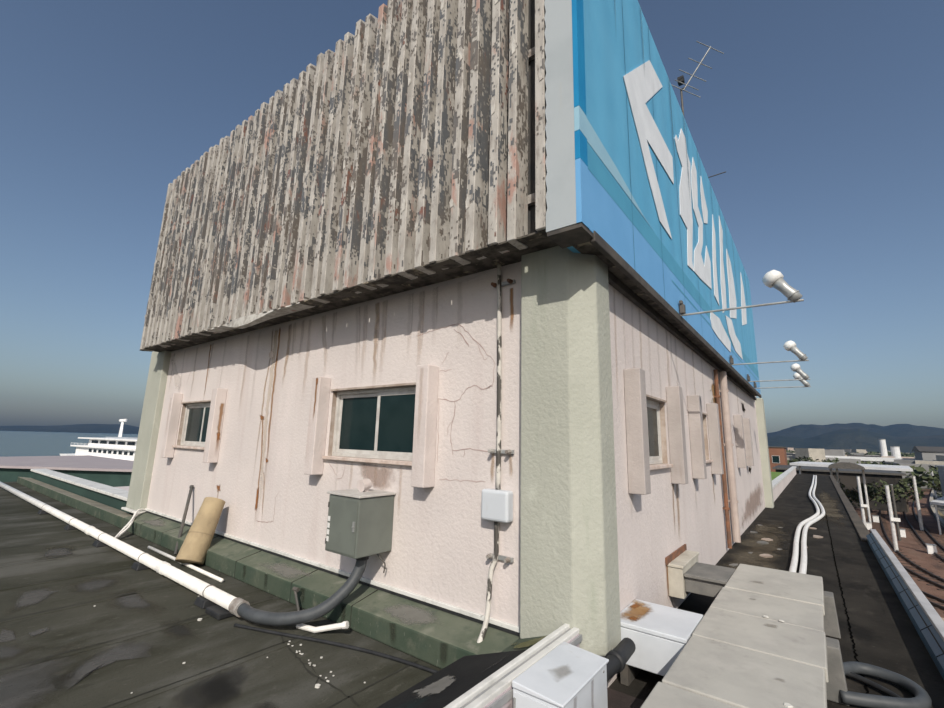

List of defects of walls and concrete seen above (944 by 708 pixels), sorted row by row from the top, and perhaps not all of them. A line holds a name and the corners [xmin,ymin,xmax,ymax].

peeling [145,0,547,342]
corrosion [255,326,290,509]
crack [418,324,495,483]
crack [825,511,869,694]